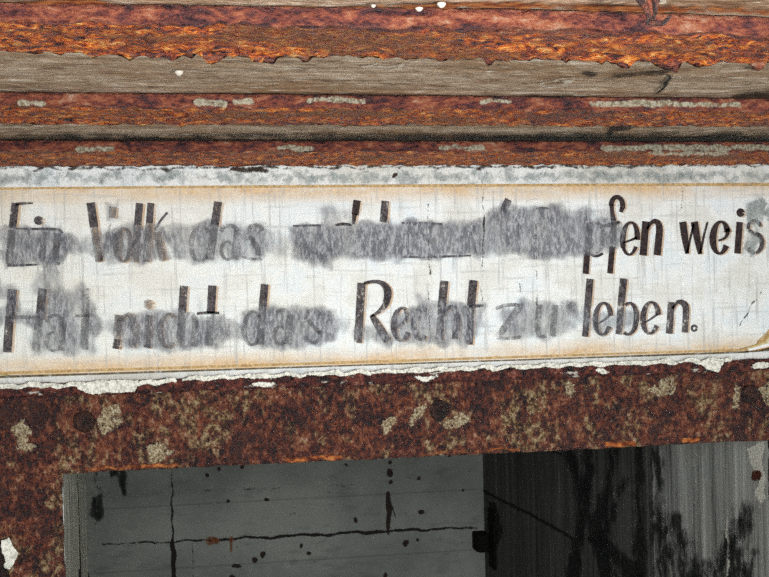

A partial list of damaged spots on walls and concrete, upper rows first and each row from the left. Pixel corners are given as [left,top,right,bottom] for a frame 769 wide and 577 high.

rust [397,2,643,12]
rust [150,165,287,173]
crack [102,469,477,577]
crack [483,490,581,547]
damp [564,445,735,577]
damp [743,549,759,577]